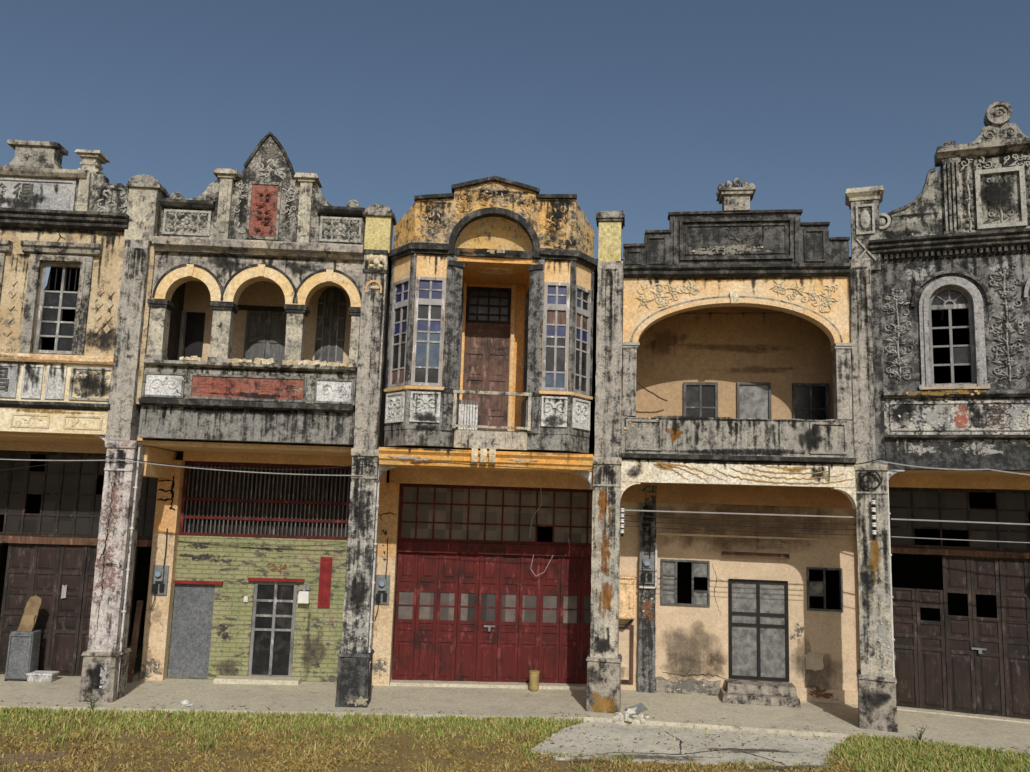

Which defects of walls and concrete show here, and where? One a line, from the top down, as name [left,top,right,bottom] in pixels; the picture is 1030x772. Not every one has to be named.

water stain [885,212,938,238]
water stain [637,277,835,290]
water stain [911,252,1030,316]
water stain [849,261,898,373]
flaking render [898,389,986,428]
water stain [885,397,1030,456]
water stain [108,449,126,487]
water stain [348,457,374,537]
water stain [625,418,888,625]
rust [598,489,612,620]
water stain [347,578,368,613]
water stain [85,664,108,696]